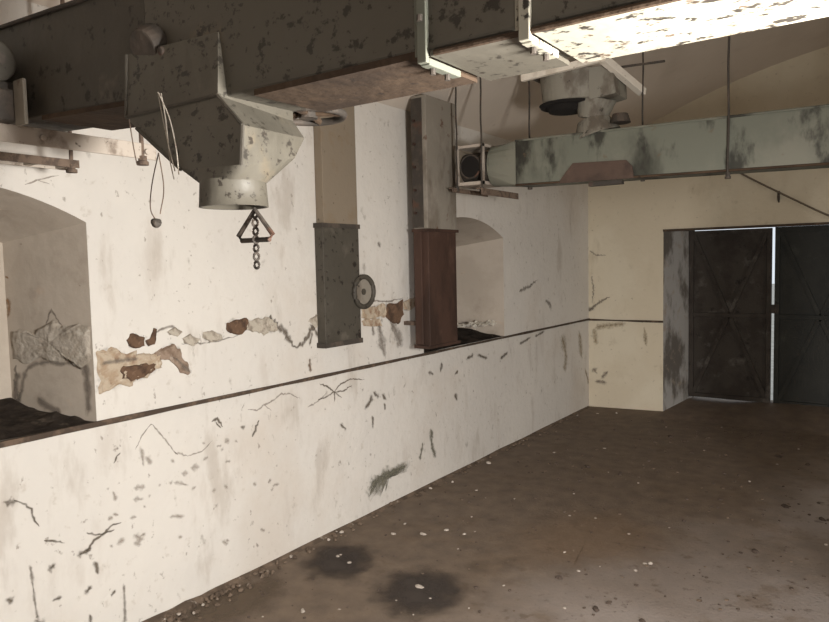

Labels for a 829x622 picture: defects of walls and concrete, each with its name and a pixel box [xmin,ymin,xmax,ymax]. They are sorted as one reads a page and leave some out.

flaking render [361,297,415,327]
flaking render [96,317,278,394]
flaking render [14,362,73,400]
crack [249,378,364,411]
leakage [370,466,405,494]